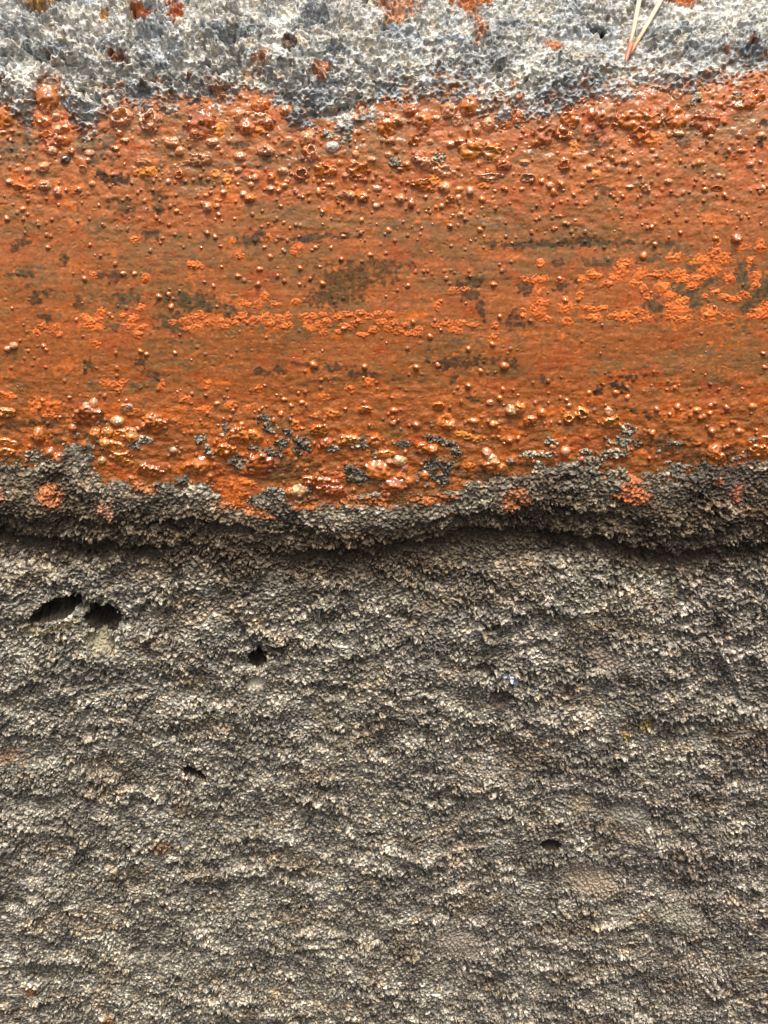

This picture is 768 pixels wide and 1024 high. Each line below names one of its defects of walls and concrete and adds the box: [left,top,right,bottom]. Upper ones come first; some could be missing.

rust [6,83,96,197]
rust [108,70,768,218]
rust [79,303,150,349]
rust [167,286,500,341]
rust [519,233,768,327]
rust [33,482,63,511]
rust [0,378,169,496]
rust [169,425,276,520]
rust [285,391,547,514]
rust [563,406,622,429]
rust [610,474,659,507]
rust [706,444,743,504]